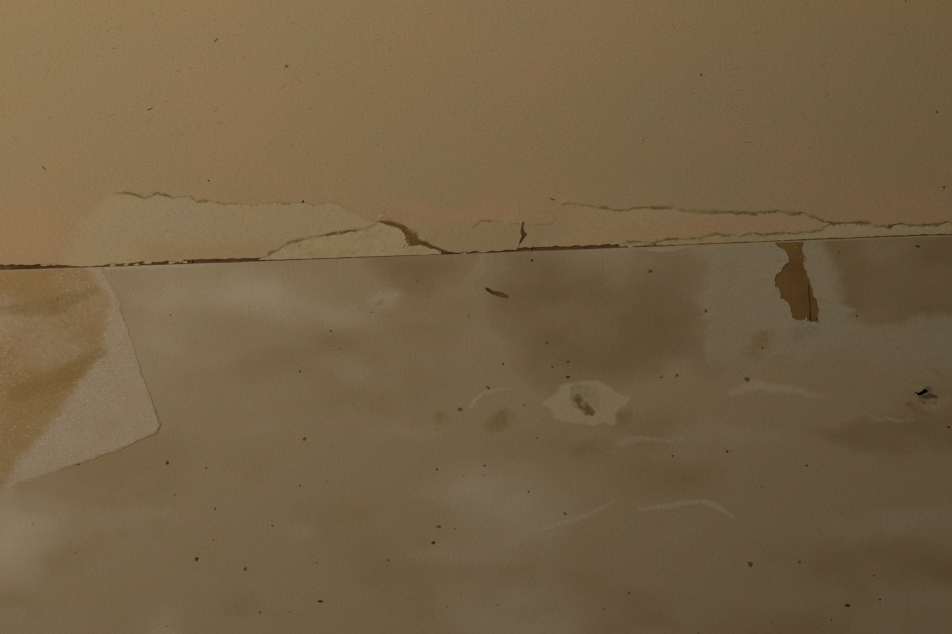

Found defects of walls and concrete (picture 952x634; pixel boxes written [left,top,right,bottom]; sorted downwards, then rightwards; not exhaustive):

peeling [41,190,384,267]
leakage [358,248,725,399]
peeling [518,201,829,323]
leakage [825,236,952,325]
spalling [540,378,634,428]
leakage [799,412,952,458]